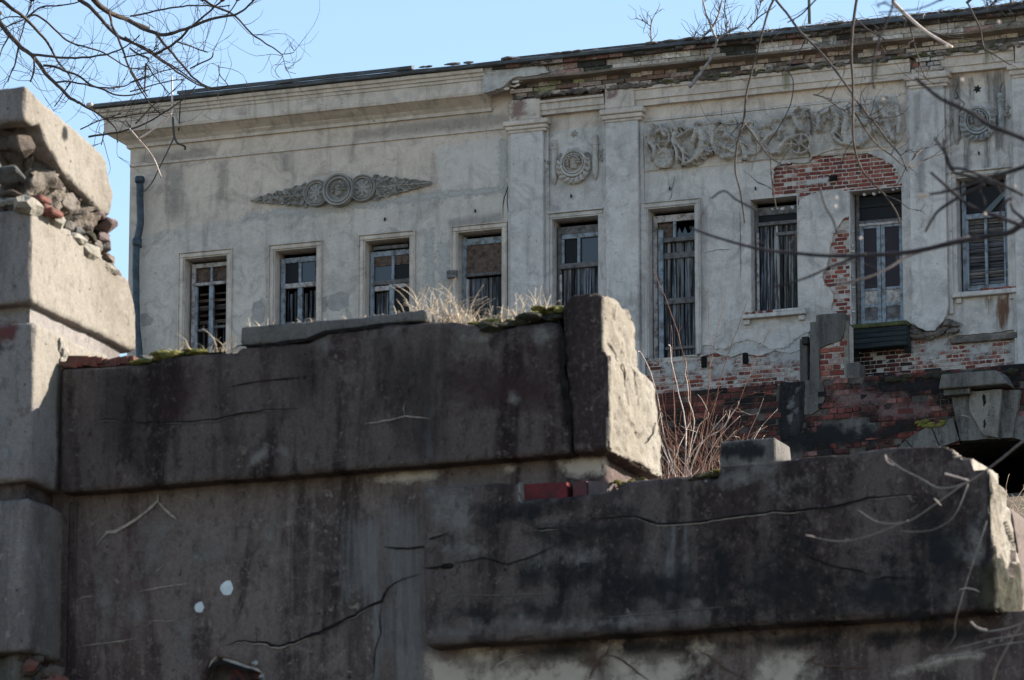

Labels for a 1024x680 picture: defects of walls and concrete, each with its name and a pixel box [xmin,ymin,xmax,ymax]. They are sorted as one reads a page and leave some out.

spalling [483,66,551,95]
spalling [30,194,63,219]
spalling [769,152,902,211]
spalling [820,216,856,325]
spalling [645,331,810,394]
spalling [819,318,1017,381]
crack [100,408,299,424]
water stain [558,458,607,478]
water stain [377,471,642,587]
water stain [342,510,432,680]
crack [228,494,916,680]
water stain [846,506,996,618]